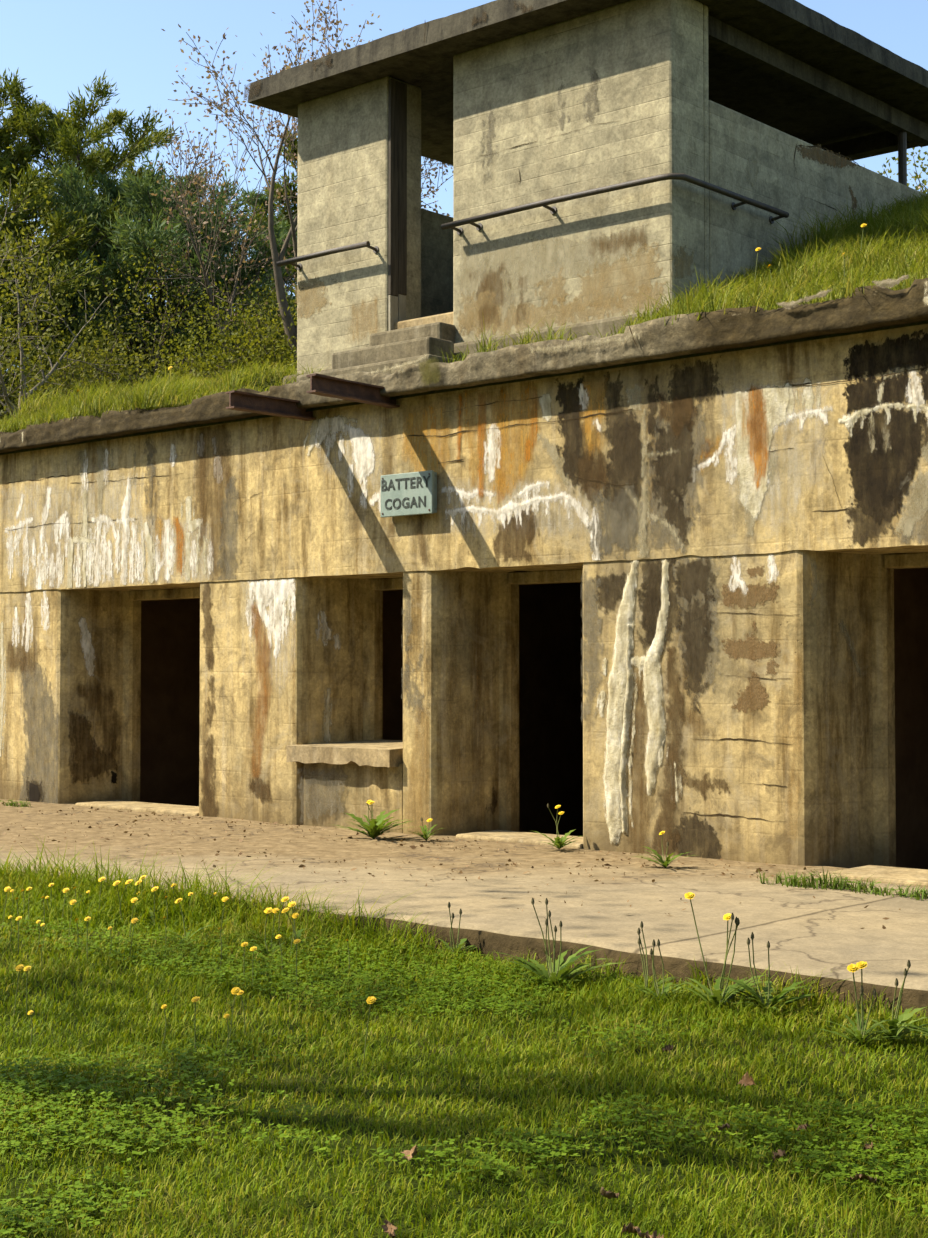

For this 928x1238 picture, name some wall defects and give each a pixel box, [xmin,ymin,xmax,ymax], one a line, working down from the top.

corrosion [403,385,537,497]
corrosion [735,383,789,519]
leakage [838,329,928,546]
leakage [0,426,241,817]
leakage [246,579,296,658]
leakage [442,356,746,859]
leakage [768,555,777,582]
corrosion [252,605,270,776]
leakage [249,778,272,802]